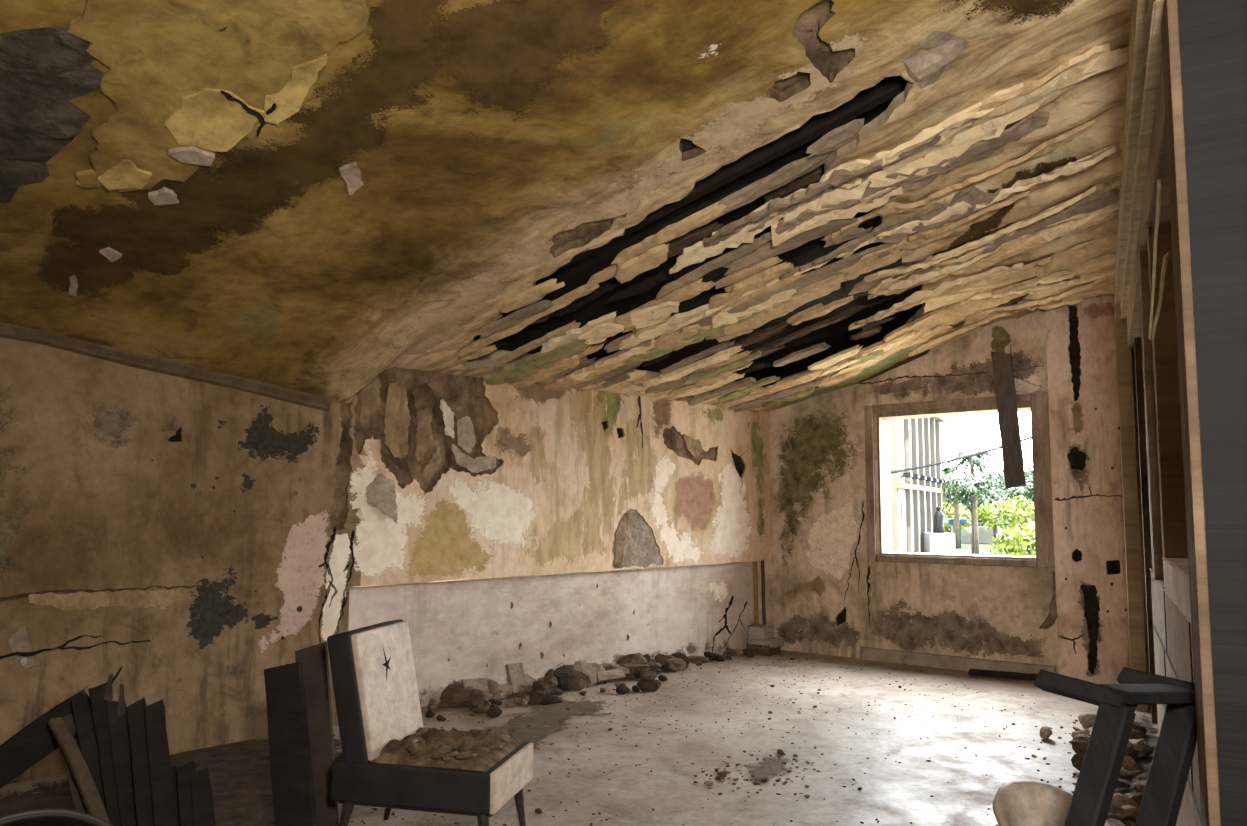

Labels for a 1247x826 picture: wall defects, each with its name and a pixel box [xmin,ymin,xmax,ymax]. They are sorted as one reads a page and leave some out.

flaking render [0,0,370,205]
flaking render [766,0,855,102]
flaking render [660,43,1128,357]
water stain [932,202,1015,256]
water stain [988,156,1077,193]
flaking render [258,367,547,653]
flaking render [612,426,752,569]
water stain [774,406,861,567]
crack [0,635,150,660]
crack [0,584,224,602]
crack [318,527,355,643]
water stain [777,575,1048,661]